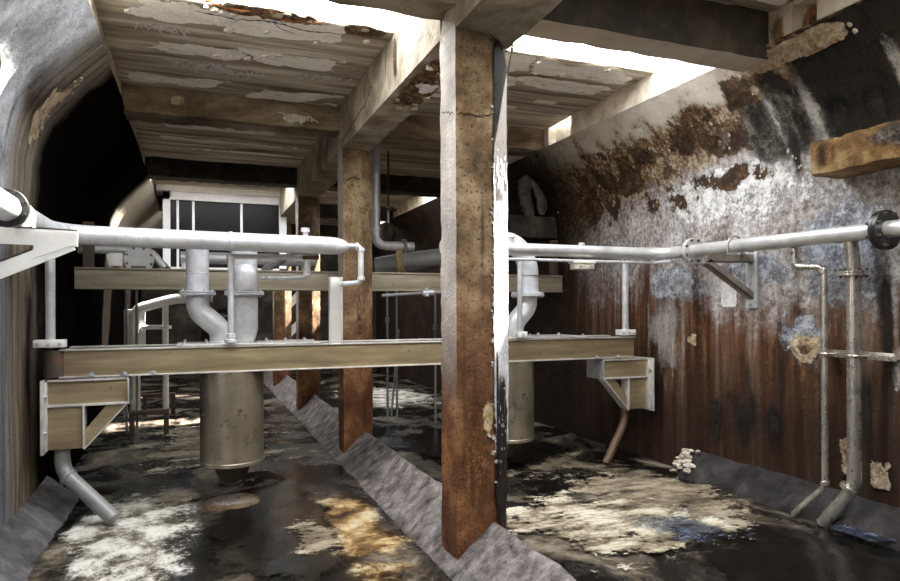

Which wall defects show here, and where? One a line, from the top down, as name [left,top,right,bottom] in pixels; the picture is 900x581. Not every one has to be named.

peeling [124,0,386,45]
peeling [145,41,354,72]
spalling [737,22,858,79]
peeling [27,77,84,145]
peeling [245,89,344,107]
spalling [393,59,441,111]
crack [441,110,492,118]
leakage [717,0,900,173]
peeling [650,265,707,365]
spalling [782,313,821,364]
spalling [483,402,494,438]
spalling [870,460,891,491]